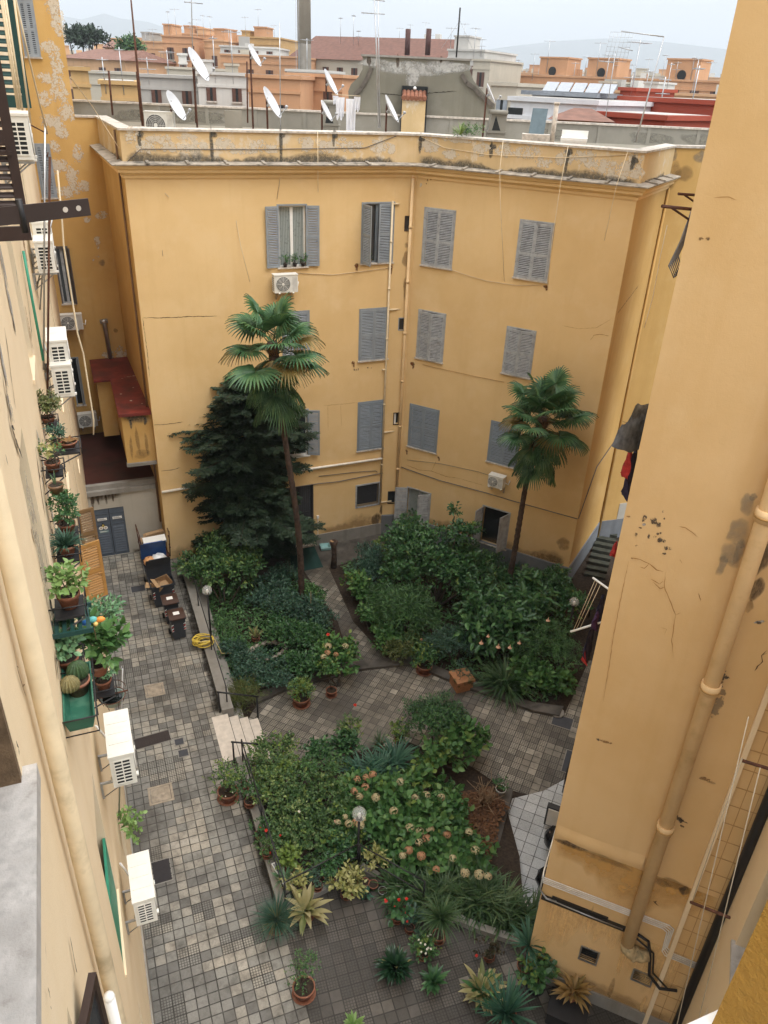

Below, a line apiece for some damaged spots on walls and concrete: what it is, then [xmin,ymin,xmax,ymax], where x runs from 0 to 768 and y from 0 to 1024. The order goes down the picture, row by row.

peeling [37,0,89,199]
peeling [125,126,279,154]
peeling [297,136,396,154]
peeling [420,135,645,181]
crack [143,316,210,375]
peeling [631,510,671,559]
water stain [751,544,768,600]
crack [603,558,682,700]
water stain [663,881,702,901]